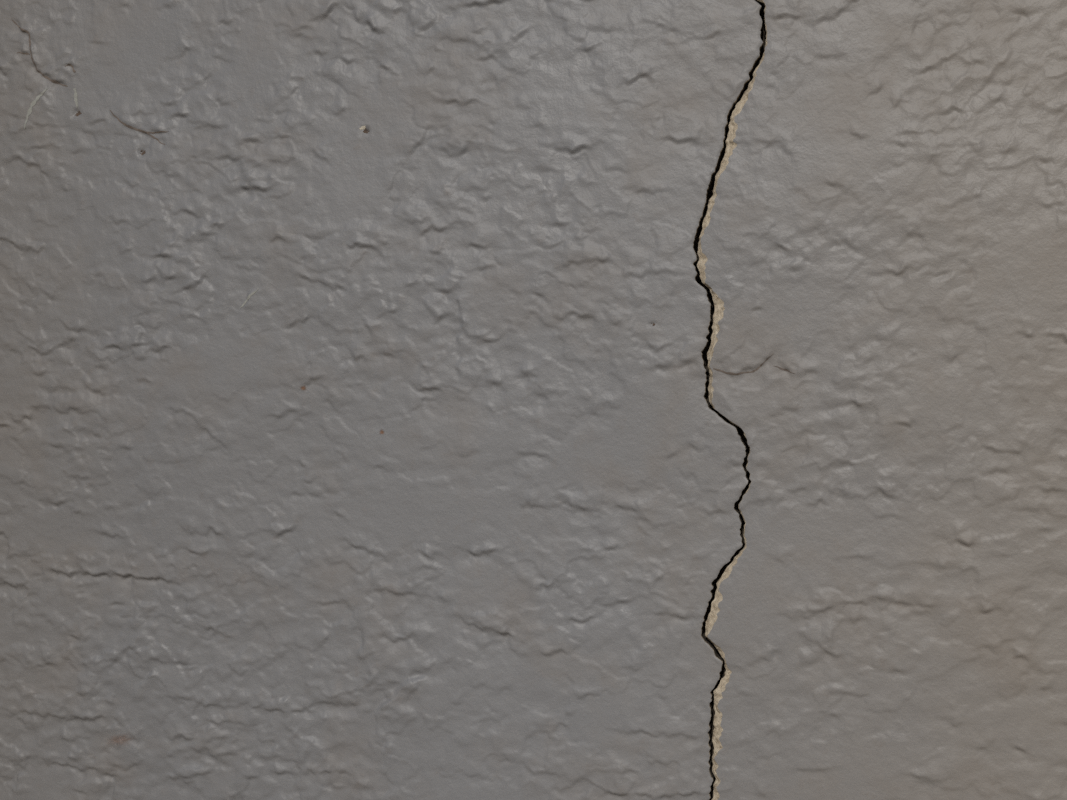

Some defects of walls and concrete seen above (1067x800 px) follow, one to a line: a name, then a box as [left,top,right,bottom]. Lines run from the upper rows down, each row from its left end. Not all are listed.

crack [693,0,795,800]